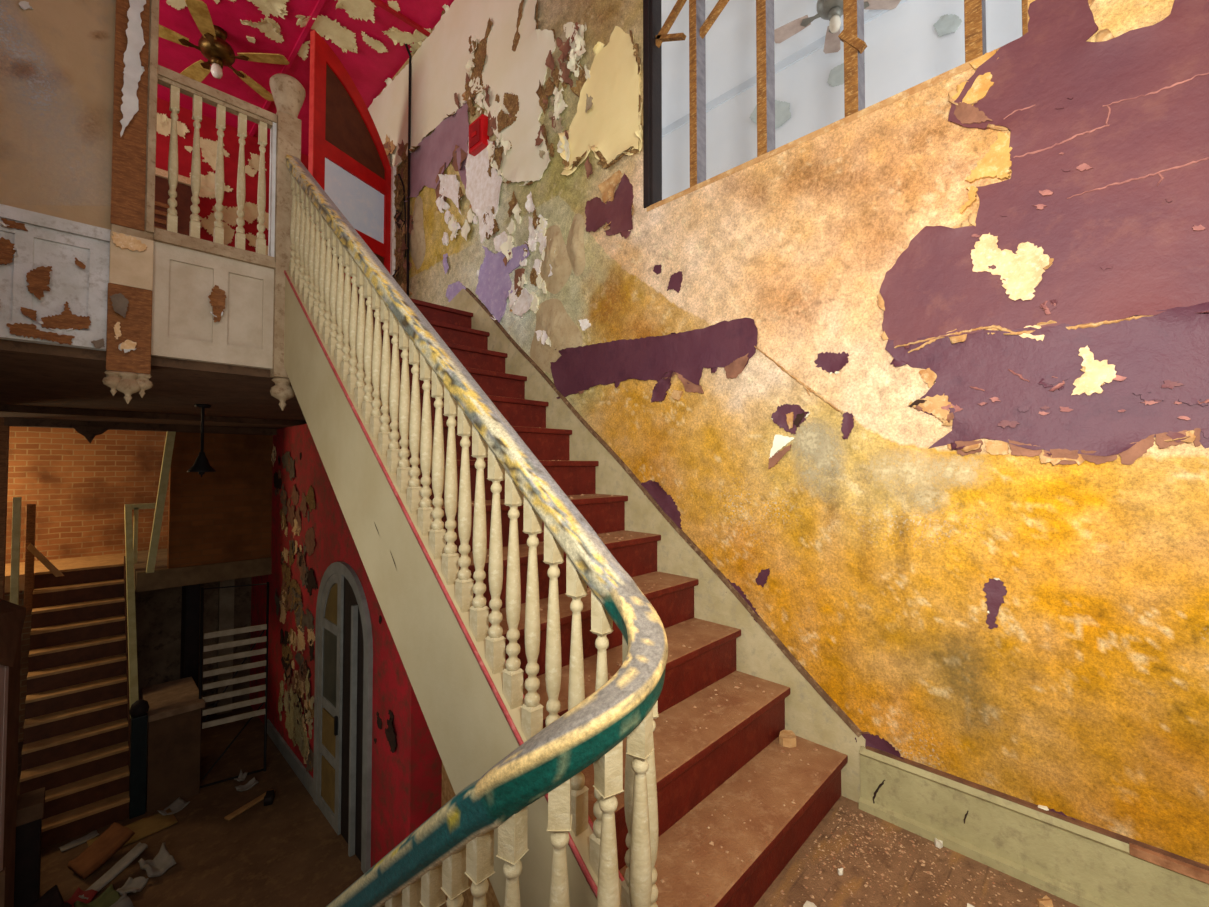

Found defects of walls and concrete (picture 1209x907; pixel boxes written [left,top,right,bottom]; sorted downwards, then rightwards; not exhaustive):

peeling [166,0,187,10]
peeling [120,0,146,136]
peeling [156,113,269,255]
peeling [214,0,643,323]
peeling [0,218,28,265]
peeling [867,0,1209,512]
peeling [6,266,137,353]
peeling [208,285,227,322]
peeling [535,317,758,402]
spalling [768,404,855,485]
peeling [271,444,318,772]
peeling [983,578,1007,629]